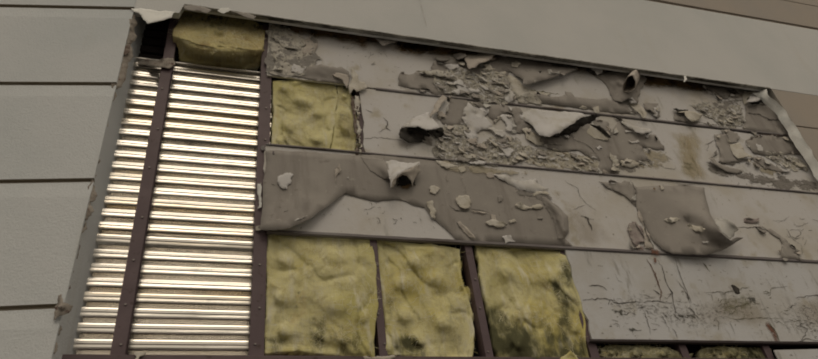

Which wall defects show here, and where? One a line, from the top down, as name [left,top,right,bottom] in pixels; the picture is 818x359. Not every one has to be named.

spalling [183,5,256,20]
peeling [264,24,367,93]
peeling [260,53,817,261]
crack [585,223,818,341]